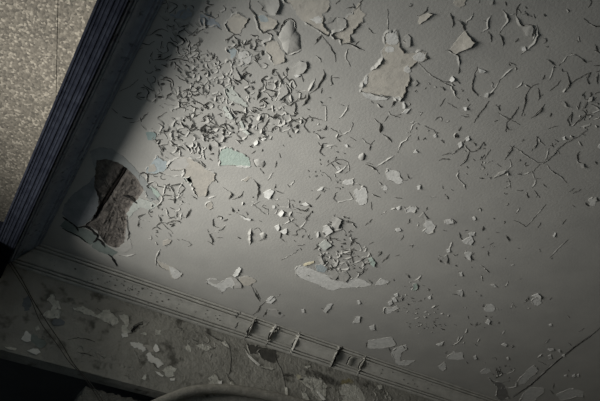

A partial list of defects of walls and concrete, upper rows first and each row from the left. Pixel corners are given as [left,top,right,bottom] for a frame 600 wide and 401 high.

peeling [184,0,367,154]
peeling [359,28,429,114]
spalling [60,138,266,266]
peeling [295,215,390,291]
peeling [391,197,436,235]
peeling [438,226,484,264]
peeling [206,267,285,318]
peeling [68,296,177,381]
peeling [366,337,415,366]